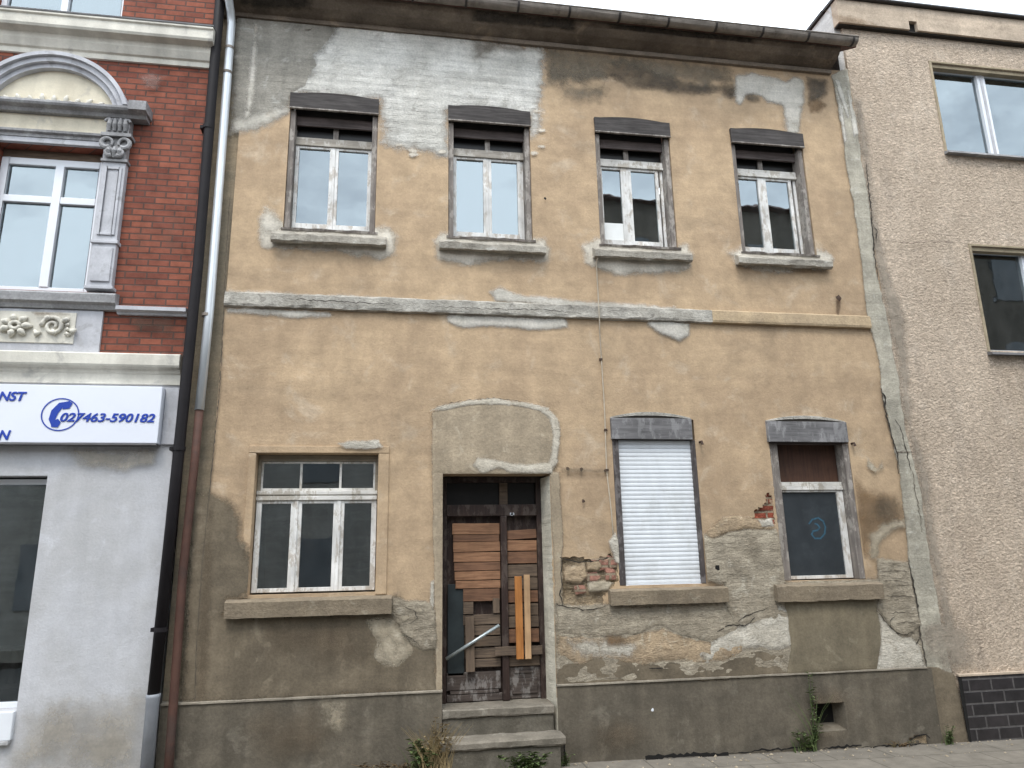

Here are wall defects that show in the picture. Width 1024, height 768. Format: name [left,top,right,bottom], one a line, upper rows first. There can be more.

damp [547,49,736,99]
crack [881,389,922,532]
damp [180,492,436,727]
flaking render [392,596,437,650]
flaking render [554,493,879,684]
crack [717,608,767,632]
peeling [876,599,926,666]
crack [878,560,927,667]